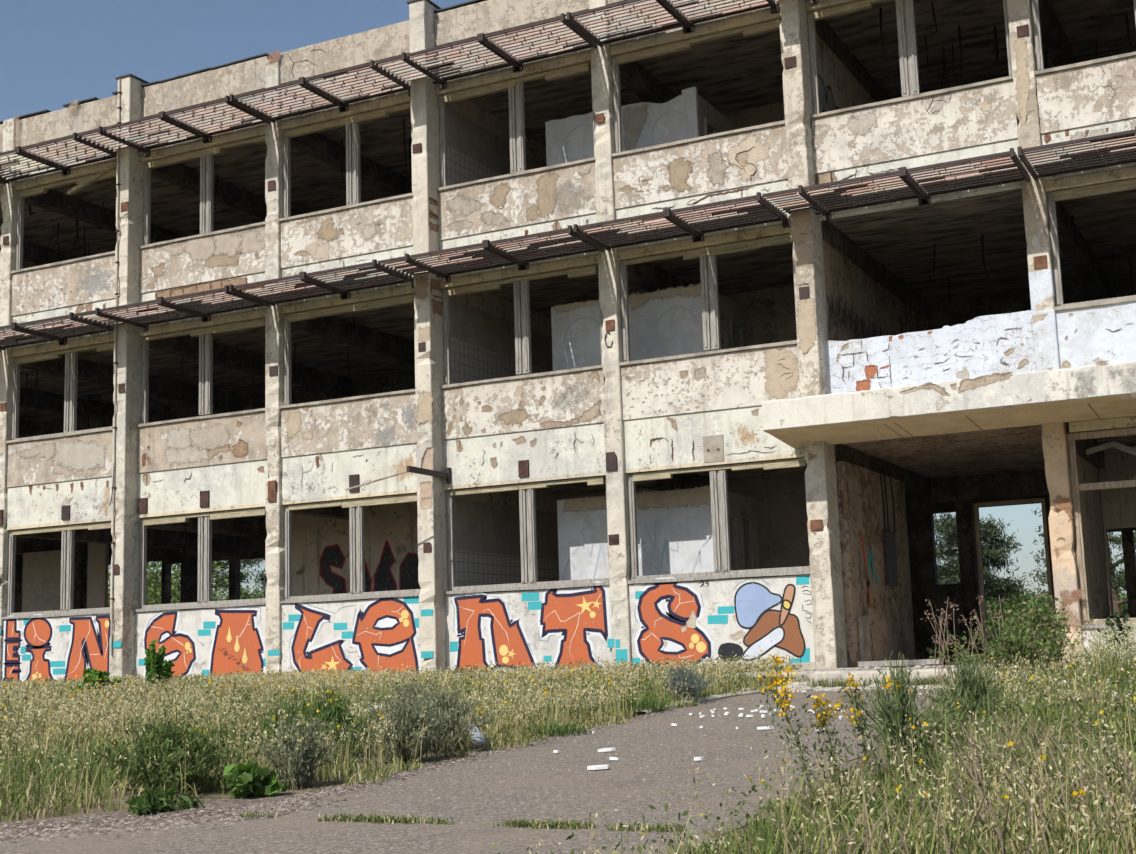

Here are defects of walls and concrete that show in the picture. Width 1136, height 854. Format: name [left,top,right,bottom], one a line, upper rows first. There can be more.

peeling [428,182,511,232]
peeling [526,171,559,222]
peeling [619,157,693,200]
spalling [706,133,770,188]
peeling [294,217,344,260]
flaking render [856,365,889,391]
peeling [165,420,248,468]